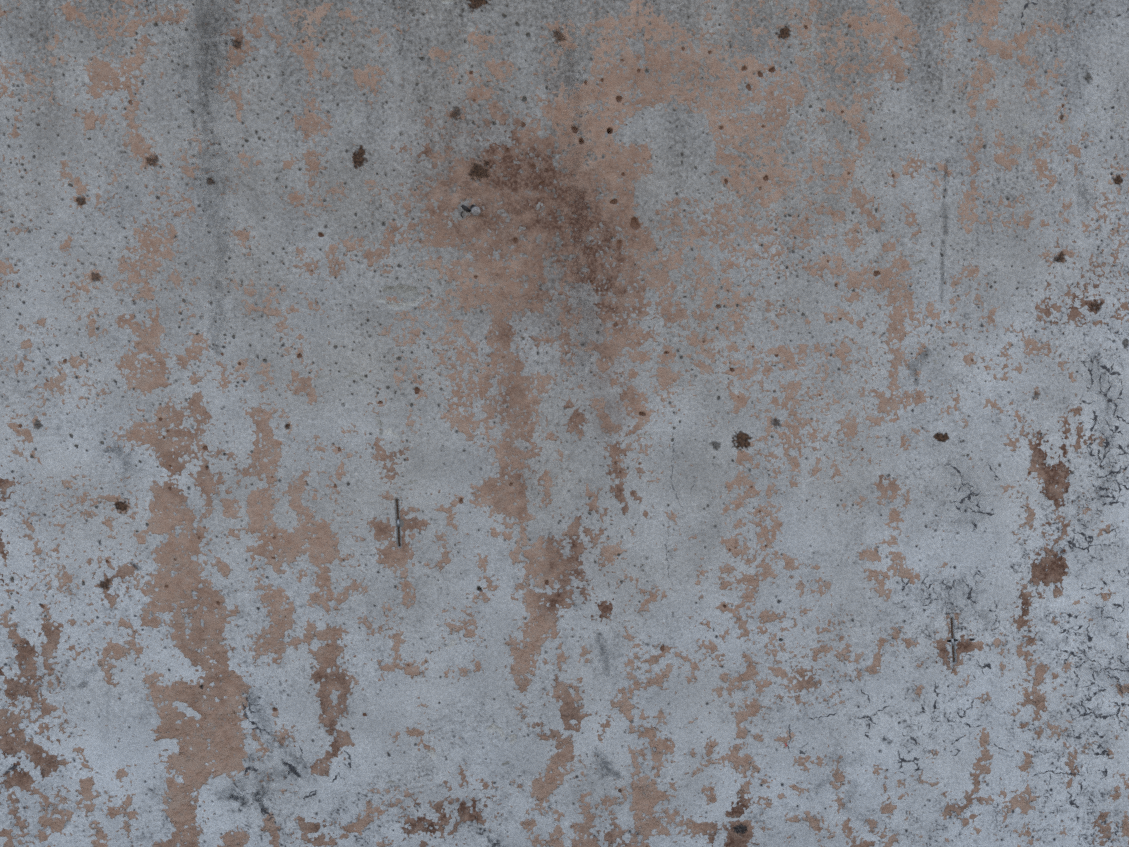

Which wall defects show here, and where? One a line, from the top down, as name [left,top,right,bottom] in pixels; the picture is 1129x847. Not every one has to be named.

corrosion [469,161,489,181]
corrosion [732,431,752,450]
crack [1067,356,1129,553]
crack [945,465,1000,531]
crack [901,570,998,624]
crack [1035,570,1129,808]
peeling [385,697,461,759]
crack [788,682,1005,773]
peeling [217,825,256,847]